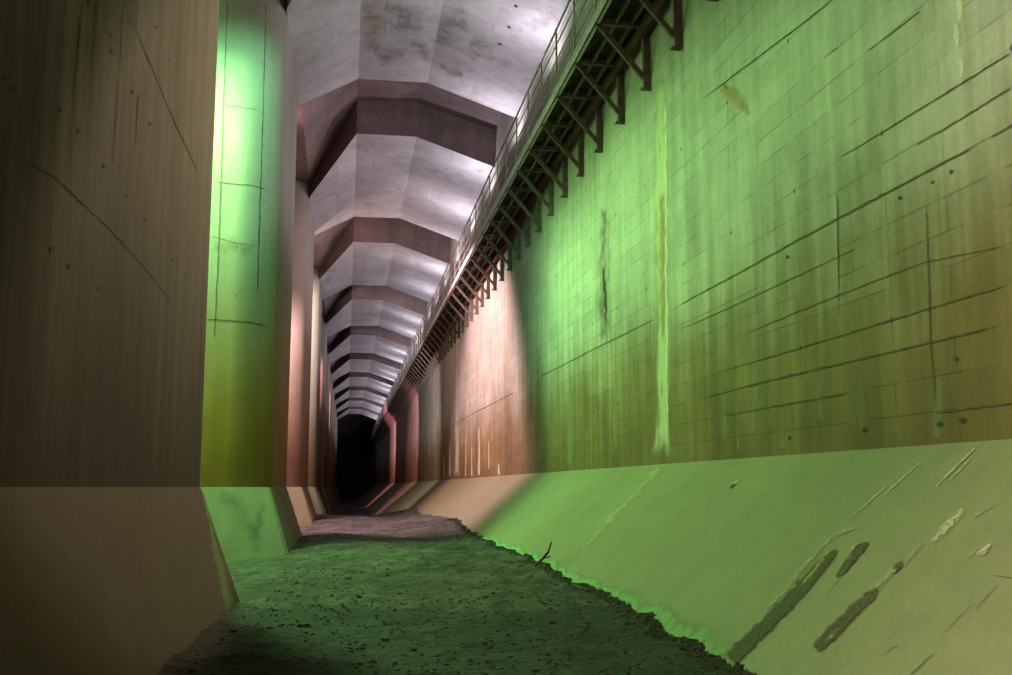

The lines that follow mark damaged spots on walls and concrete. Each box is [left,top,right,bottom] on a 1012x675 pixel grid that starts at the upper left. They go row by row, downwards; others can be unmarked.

crack [130,6,266,337]
spalling [727,527,868,663]
spalling [813,506,991,650]